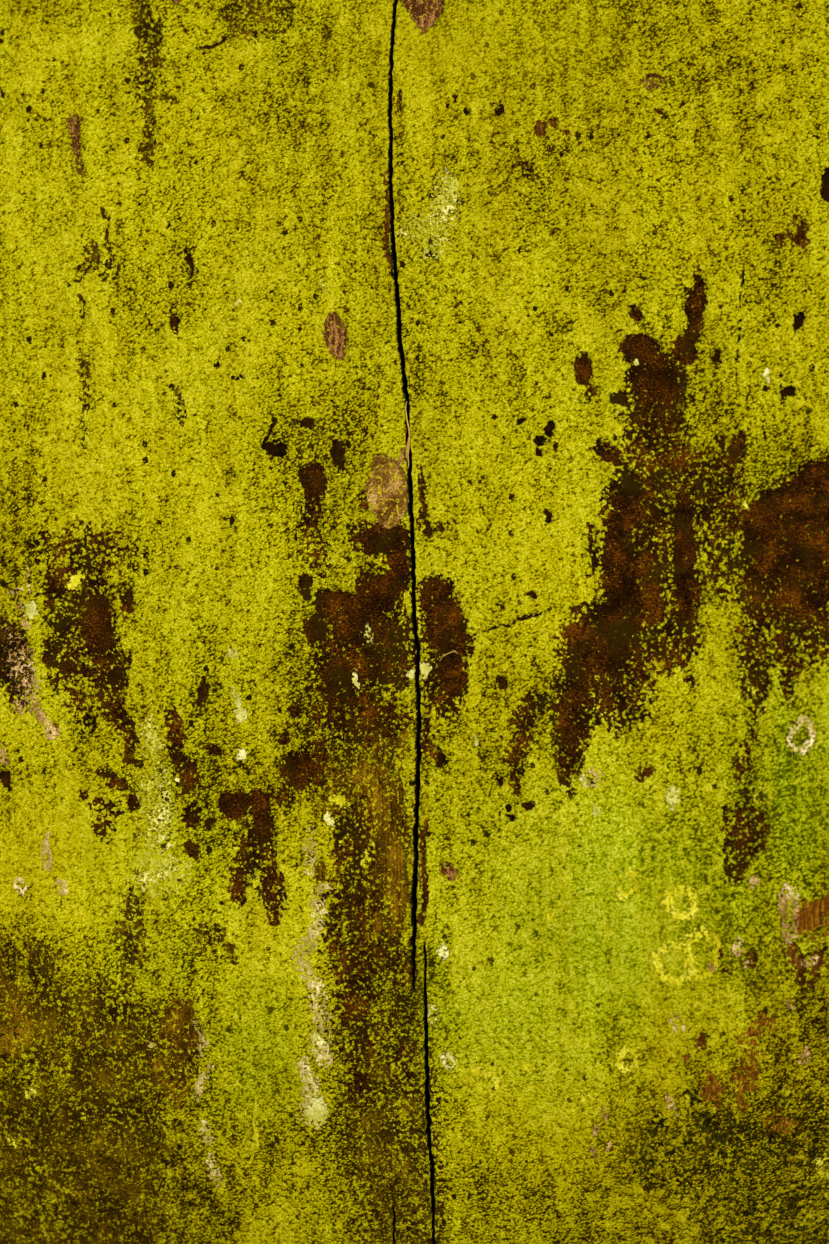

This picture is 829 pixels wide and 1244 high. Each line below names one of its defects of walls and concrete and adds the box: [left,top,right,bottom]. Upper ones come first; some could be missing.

peeling [401,0,445,34]
crack [388,0,436,1244]
damp [719,740,774,887]